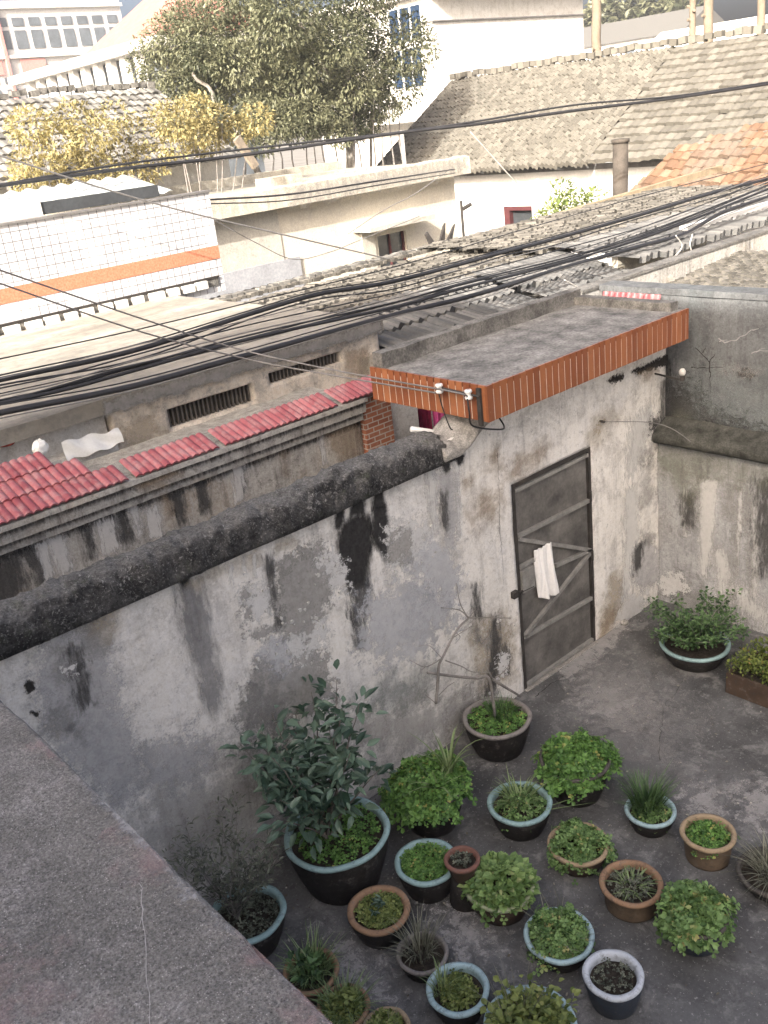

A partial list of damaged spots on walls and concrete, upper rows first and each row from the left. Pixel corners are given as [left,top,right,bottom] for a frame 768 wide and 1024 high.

crack [719,328,764,354]
leakage [0,535,73,600]
leakage [79,505,162,559]
leakage [168,478,212,528]
leakage [174,578,222,712]
leakage [230,464,248,505]
leakage [229,553,282,626]
leakage [335,454,465,673]
leakage [621,361,768,602]
leakage [679,476,768,631]
leakage [26,624,214,847]
crack [138,882,150,1024]